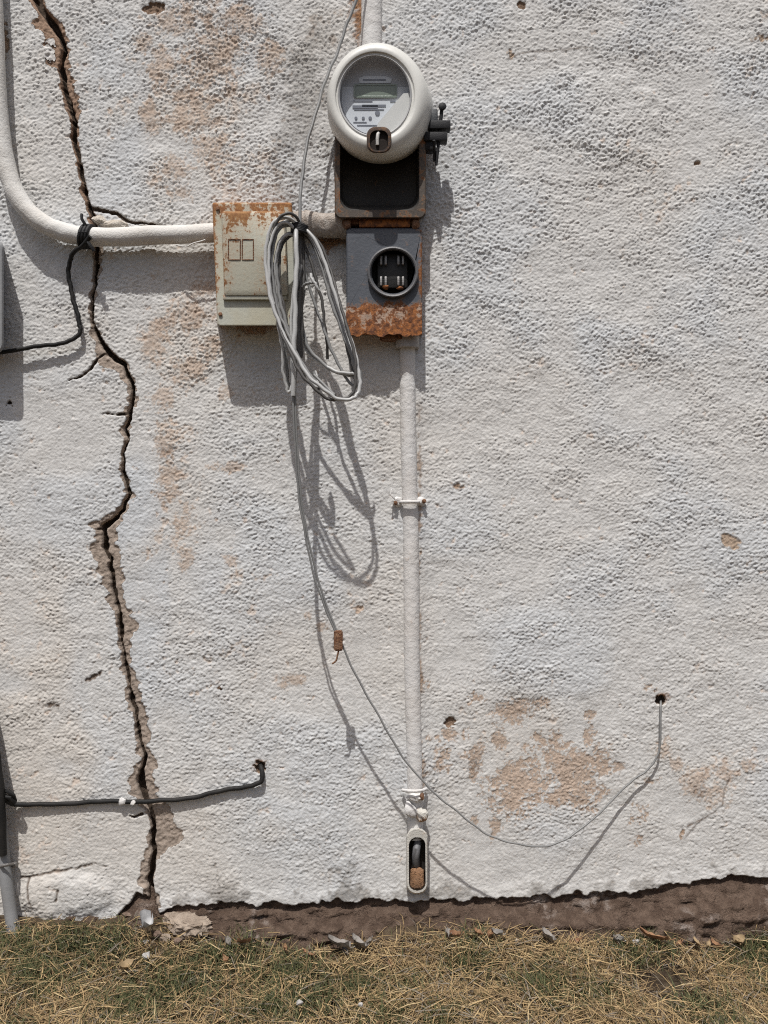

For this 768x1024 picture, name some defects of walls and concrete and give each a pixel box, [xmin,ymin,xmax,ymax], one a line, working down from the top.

rust [346,302,422,337]
crack [21,0,184,911]
peeling [425,690,625,839]
spalling [153,930,183,944]